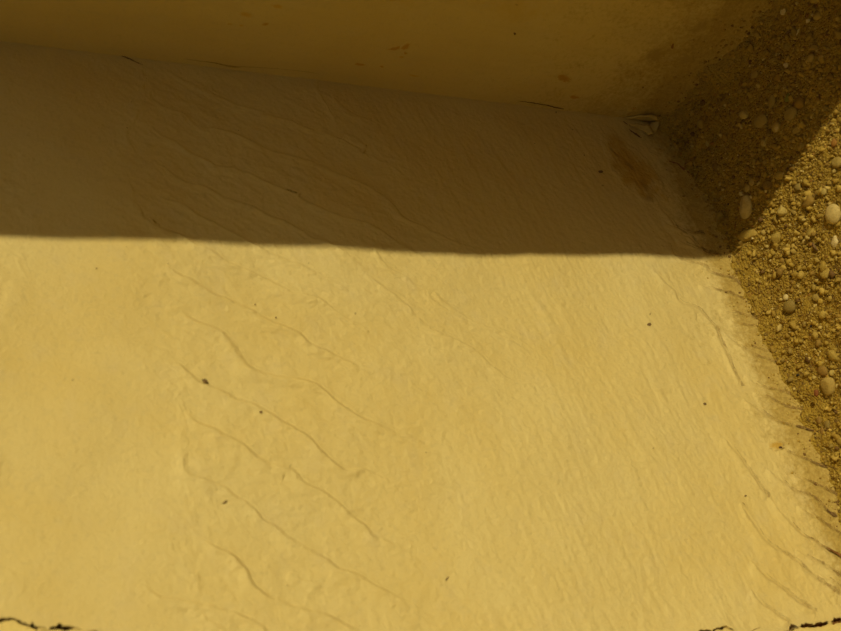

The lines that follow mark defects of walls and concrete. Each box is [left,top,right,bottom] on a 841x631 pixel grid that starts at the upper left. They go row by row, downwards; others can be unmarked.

crack [31,623,80,631]
crack [789,619,841,631]